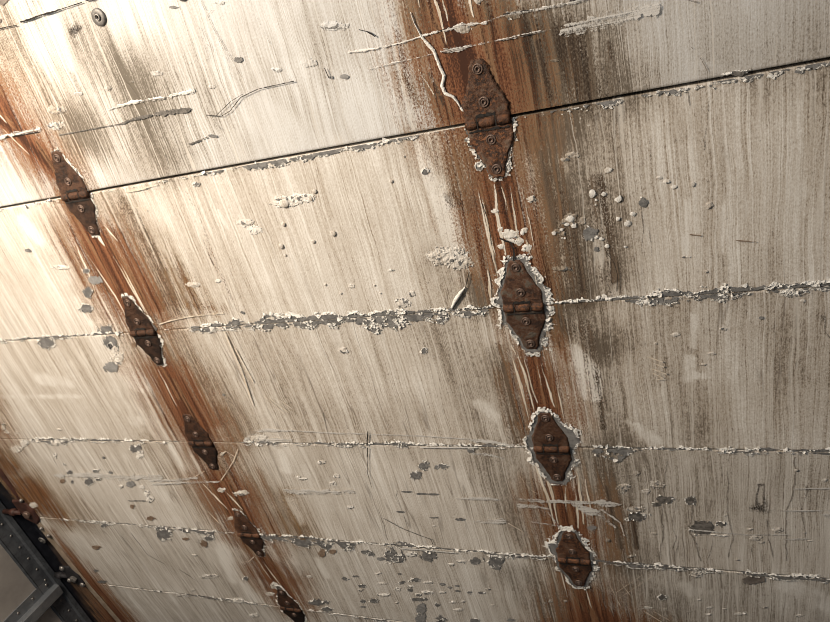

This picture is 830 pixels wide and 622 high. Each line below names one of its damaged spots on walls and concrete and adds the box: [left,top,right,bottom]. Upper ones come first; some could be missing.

crack [207,81,294,116]
peeling [634,62,830,98]
peeling [155,135,418,187]
rust [377,0,588,439]
peeling [121,293,169,367]
rust [0,59,322,622]
peeling [187,227,830,357]
peeling [239,407,582,486]
peeling [592,444,830,463]
peeling [228,508,721,590]
rust [511,453,661,622]
peeling [136,572,490,622]